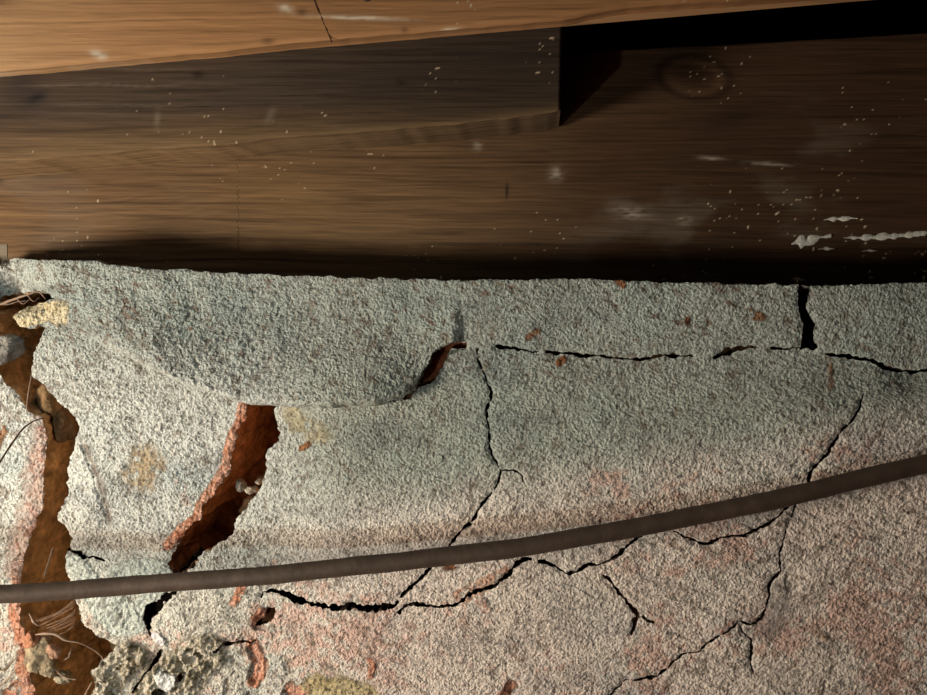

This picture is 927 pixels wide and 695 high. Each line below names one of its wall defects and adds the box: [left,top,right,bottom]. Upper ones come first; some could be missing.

crack [0,291,117,695]
rust [123,449,163,488]
crack [143,402,281,636]
spalling [392,342,467,402]
crack [260,536,653,634]
crack [448,272,927,546]
crack [609,505,796,695]